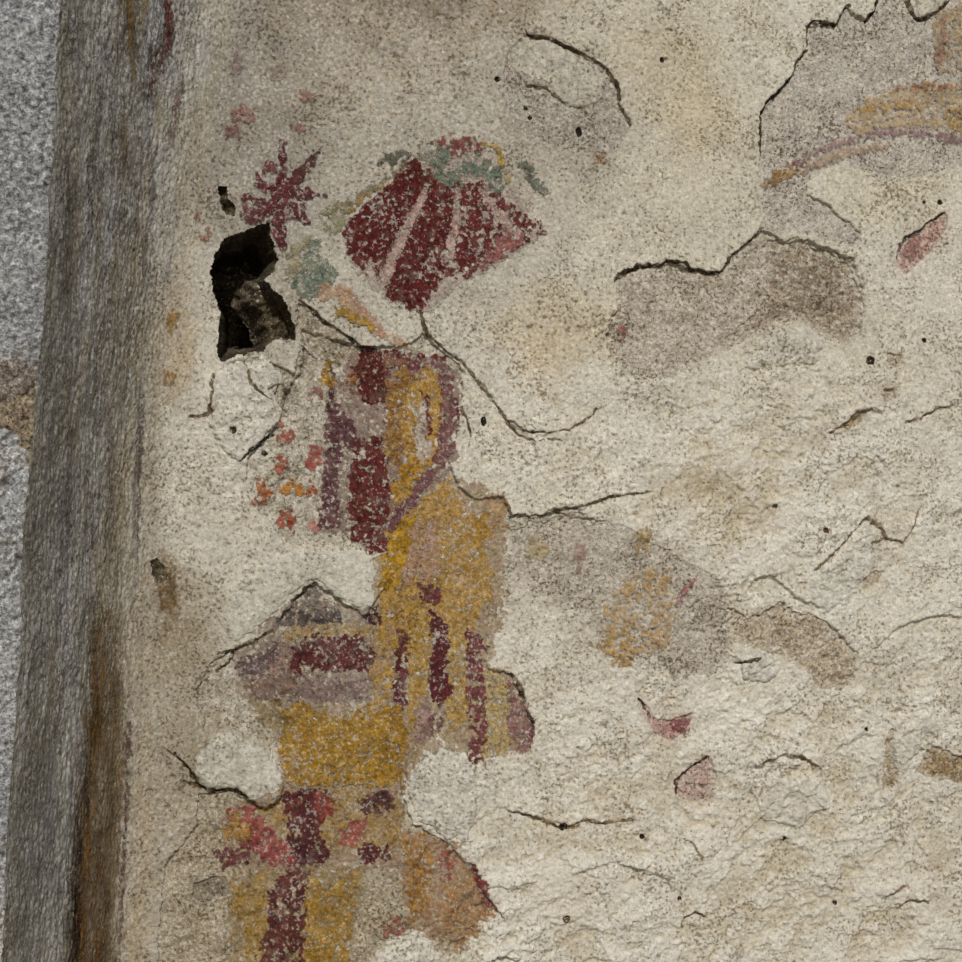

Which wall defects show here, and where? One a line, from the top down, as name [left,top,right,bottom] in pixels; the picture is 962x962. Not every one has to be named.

crack [525,29,632,128]
crack [758,0,879,157]
crack [614,226,764,283]
spalling [605,0,962,381]
crack [419,312,598,442]
spalling [844,411,865,431]
crack [507,490,651,521]
spalling [157,274,858,962]
rust [63,590,133,962]